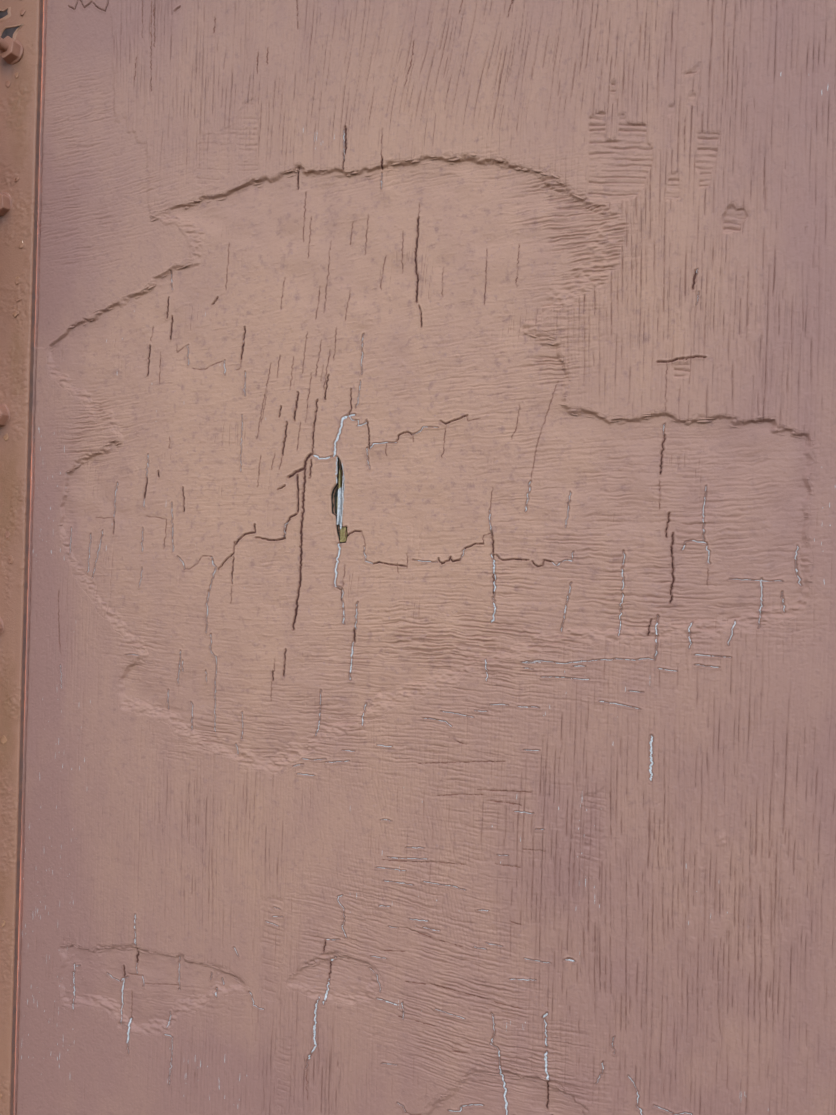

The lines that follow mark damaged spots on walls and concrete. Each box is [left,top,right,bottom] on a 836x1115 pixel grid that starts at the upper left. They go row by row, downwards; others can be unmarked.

peeling [0,7,26,40]
crack [511,386,556,512]
crack [523,356,801,709]
crack [647,736,655,781]